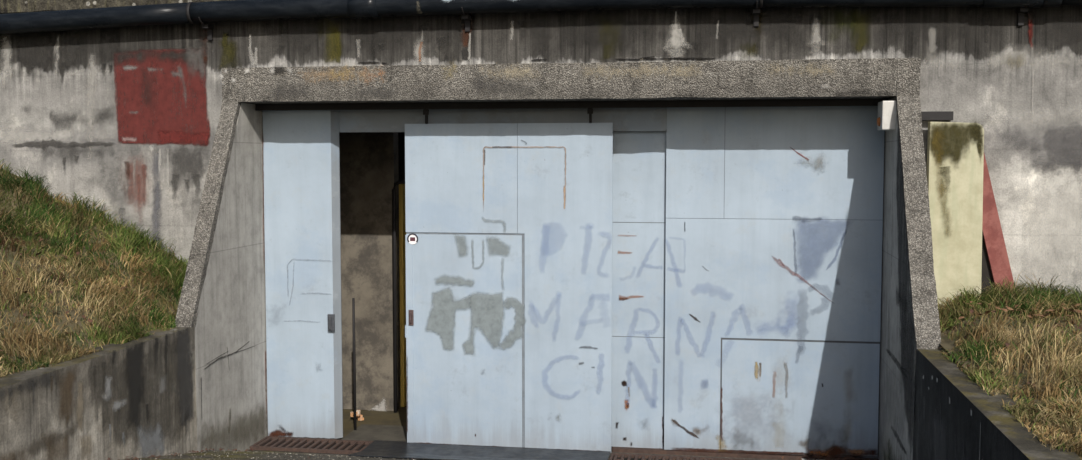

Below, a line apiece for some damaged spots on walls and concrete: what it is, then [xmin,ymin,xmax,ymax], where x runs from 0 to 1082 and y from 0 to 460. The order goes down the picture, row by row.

water stain [670,11,685,49]
water stain [696,13,801,39]
water stain [2,30,118,95]
water stain [0,112,112,166]
water stain [1046,127,1082,165]
water stain [150,146,204,247]
corrosion [659,388,877,457]